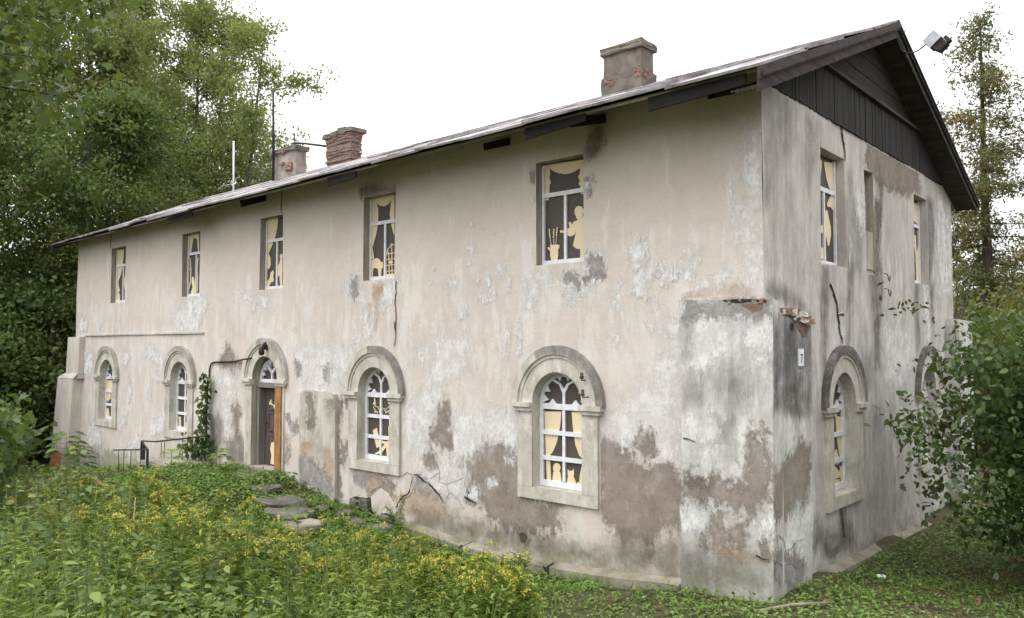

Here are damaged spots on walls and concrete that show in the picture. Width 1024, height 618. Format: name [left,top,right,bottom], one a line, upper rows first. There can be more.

crack [371,465,476,512]
flaking render [284,261,566,544]
flaking render [556,117,841,591]
crack [830,284,845,343]